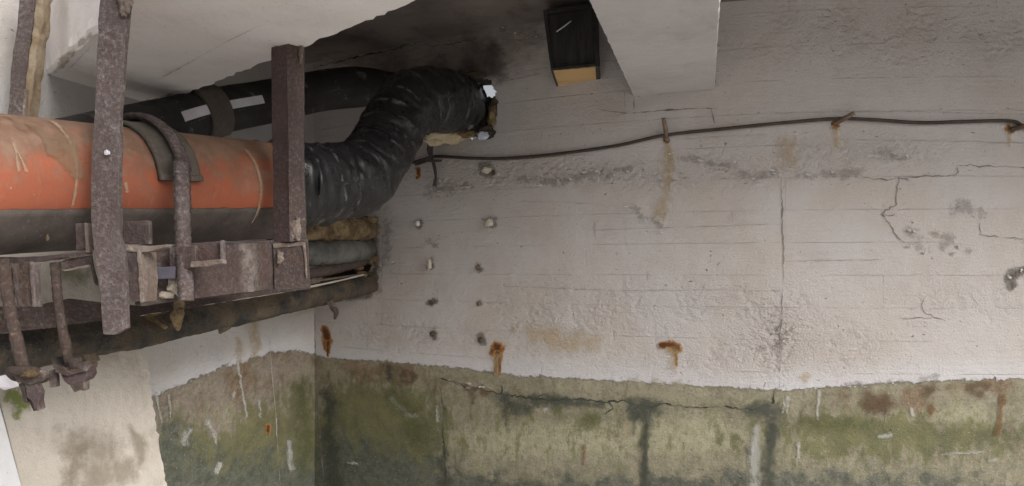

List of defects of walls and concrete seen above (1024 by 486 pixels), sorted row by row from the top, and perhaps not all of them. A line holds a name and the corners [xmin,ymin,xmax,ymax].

crack [864,141,1024,242]
corrosion [320,325,333,357]
corrosion [489,341,505,376]
crack [440,179,884,479]
corrosion [658,340,683,366]
damp [233,362,261,416]
damp [468,388,604,426]
damp [864,392,890,413]
corrosion [994,395,1006,435]
damp [629,398,661,486]
damp [744,396,790,486]